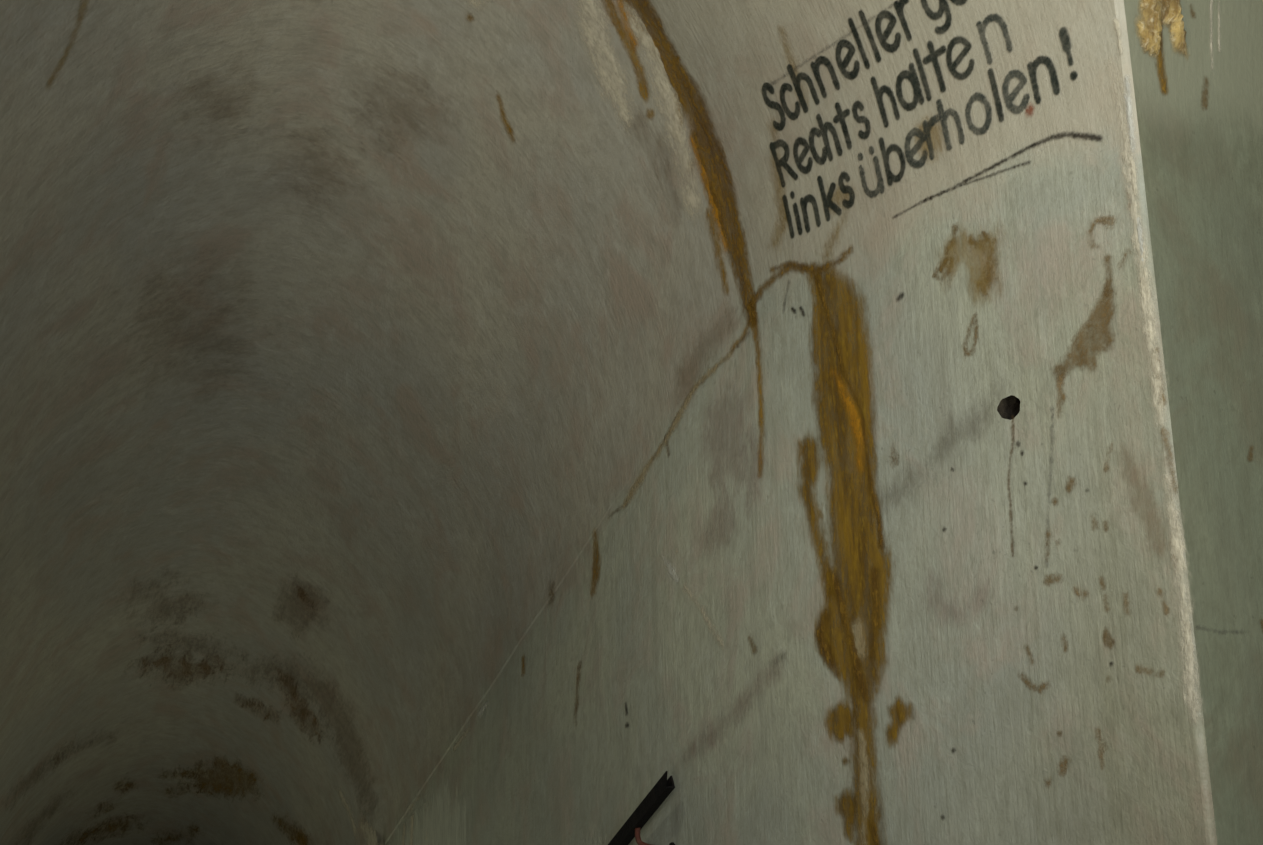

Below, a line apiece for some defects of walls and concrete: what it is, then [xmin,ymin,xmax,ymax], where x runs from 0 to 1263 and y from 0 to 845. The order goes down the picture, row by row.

leakage [1055,278,1114,408]
corrosion [601,0,911,845]
corrosion [591,532,600,593]